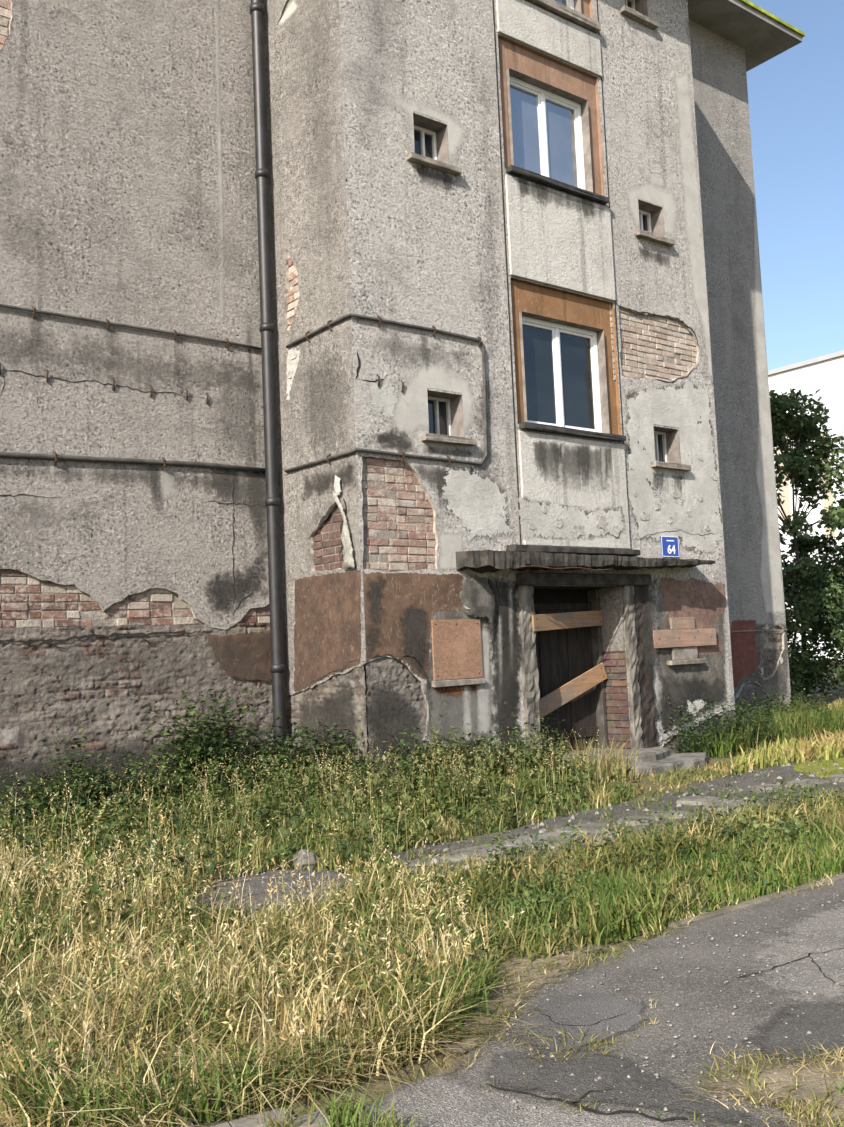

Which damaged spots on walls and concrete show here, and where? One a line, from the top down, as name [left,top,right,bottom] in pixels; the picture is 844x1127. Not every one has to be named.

flaking render [0,0,13,51]
crack [0,370,205,425]
peeling [369,376,401,418]
peeling [609,302,723,554]
leakage [535,442,611,487]
leakage [207,559,264,612]
flaking render [288,457,513,740]
flaking render [0,569,272,682]
peeling [687,699,705,716]
crack [736,948,843,986]
crack [485,1083,687,1121]